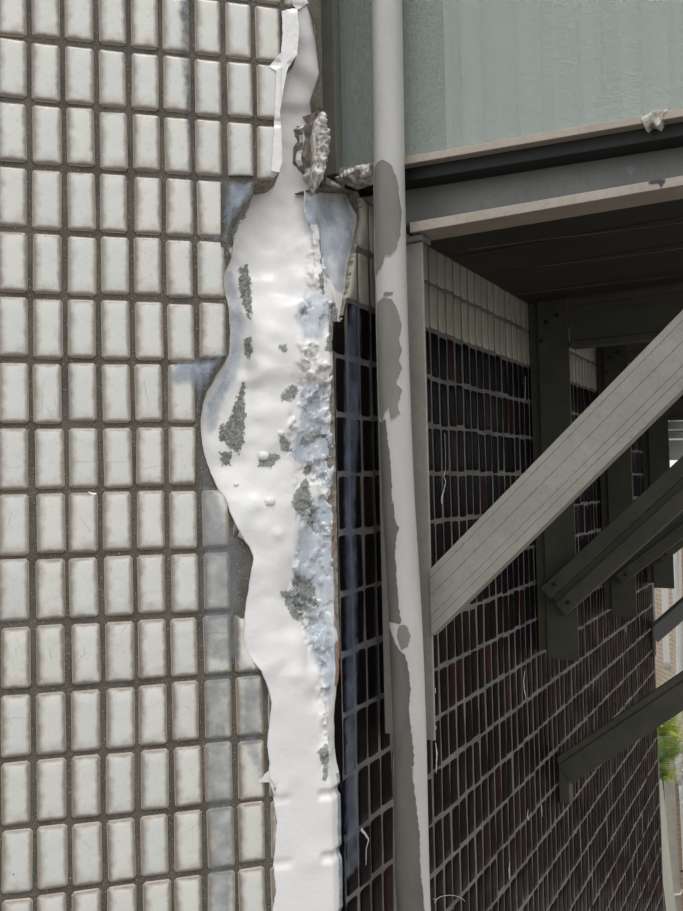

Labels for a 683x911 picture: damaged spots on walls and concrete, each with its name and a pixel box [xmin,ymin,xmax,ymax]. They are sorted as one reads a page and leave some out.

spalling [225,173,279,319]
peeling [373,159,403,277]
spalling [218,382,247,467]
spalling [243,337,253,358]
spalling [257,8,362,794]
peeling [376,292,425,911]